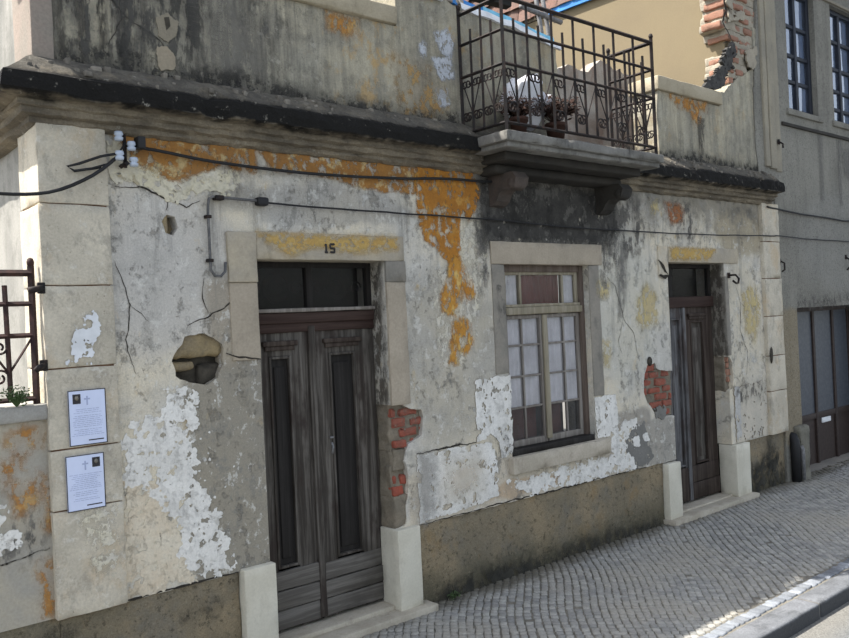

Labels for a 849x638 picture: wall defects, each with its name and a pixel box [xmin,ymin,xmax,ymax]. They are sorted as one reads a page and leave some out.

damp [56,0,308,99]
flaking render [699,0,758,86]
damp [321,97,393,112]
peeling [106,140,241,205]
peeling [65,310,101,365]
crack [115,264,148,374]
flaking render [644,357,672,420]
peeling [120,333,237,599]
flaking render [379,465,406,498]
flaking render [376,404,421,452]
peeling [506,417,654,497]
peeling [0,505,23,557]